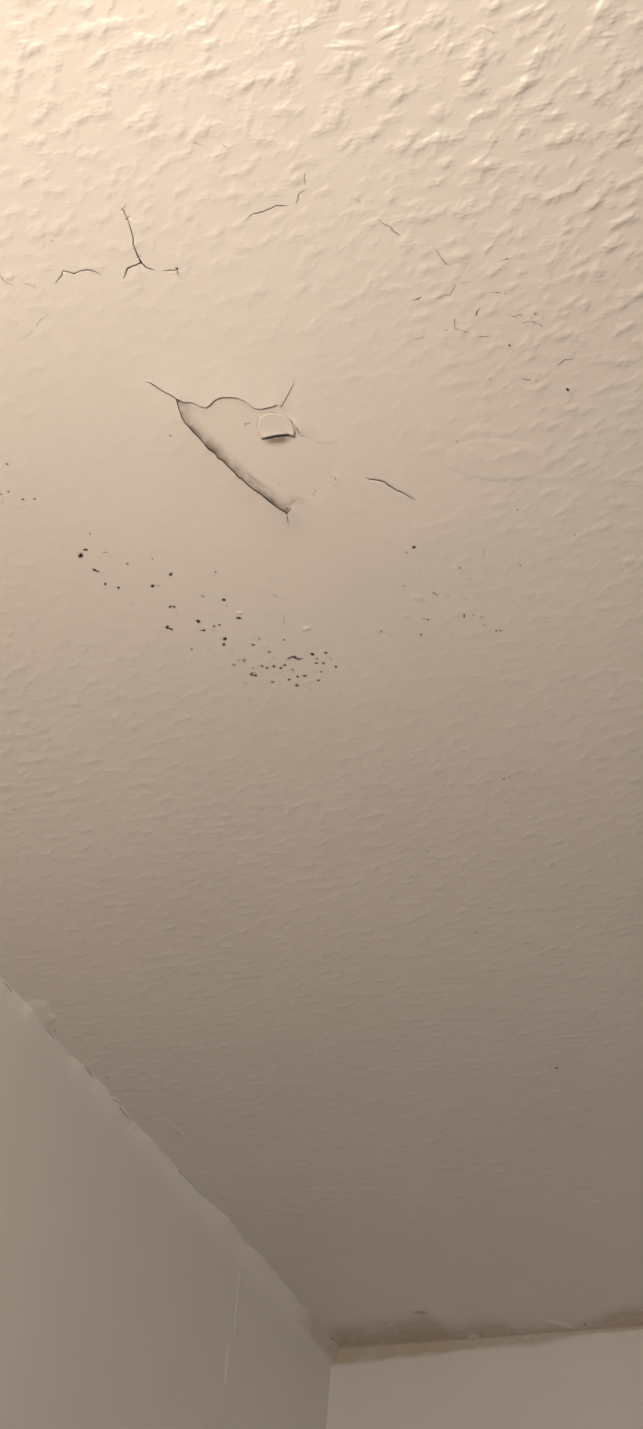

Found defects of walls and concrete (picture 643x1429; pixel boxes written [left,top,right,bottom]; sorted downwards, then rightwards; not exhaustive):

crack [245,174,307,220]
crack [0,203,181,287]
peeling [116,341,382,559]
crack [365,476,416,500]